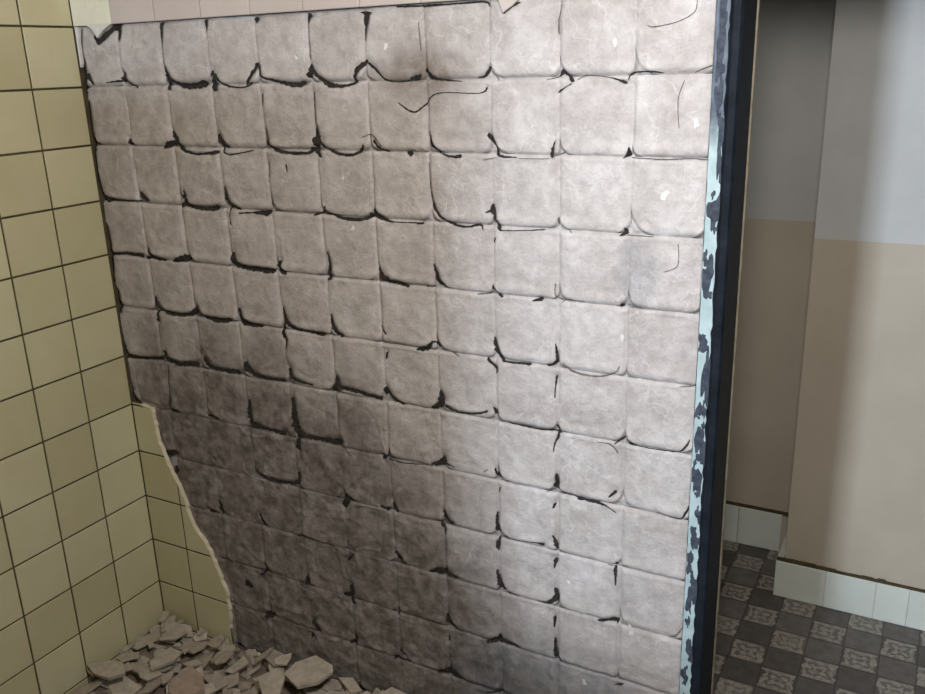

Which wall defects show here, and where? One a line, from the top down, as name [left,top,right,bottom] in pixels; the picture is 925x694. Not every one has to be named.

crack [81,24,150,202]
crack [160,0,572,242]
crack [547,69,663,93]
crack [107,227,193,313]
crack [230,252,287,275]
crack [379,264,447,288]
crack [125,296,404,450]
spalling [74,0,728,694]
crack [487,337,620,397]
crack [431,390,617,513]
crack [598,436,690,454]
crack [483,467,562,661]